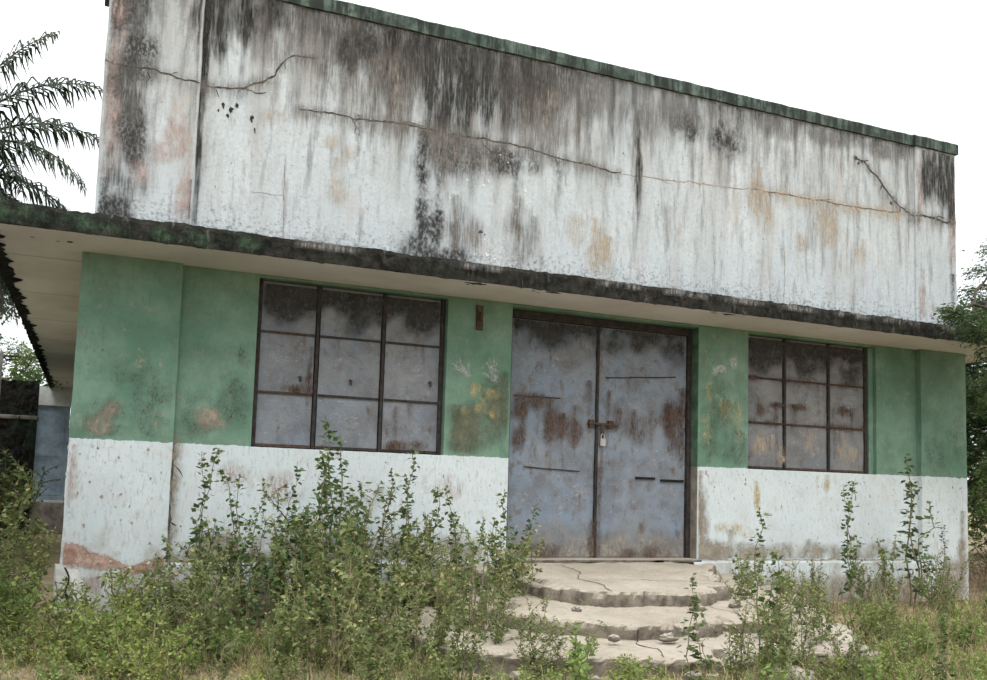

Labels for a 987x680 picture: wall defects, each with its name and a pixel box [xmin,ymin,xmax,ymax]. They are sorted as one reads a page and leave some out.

water stain [107,0,158,99]
crack [105,55,316,97]
water stain [193,0,563,182]
water stain [112,106,147,162]
crack [295,106,956,225]
water stain [577,72,700,202]
water stain [713,123,737,152]
water stain [921,150,955,220]
water stain [402,196,502,272]
rust [513,393,583,448]
rust [606,388,685,452]
spalling [63,543,188,591]